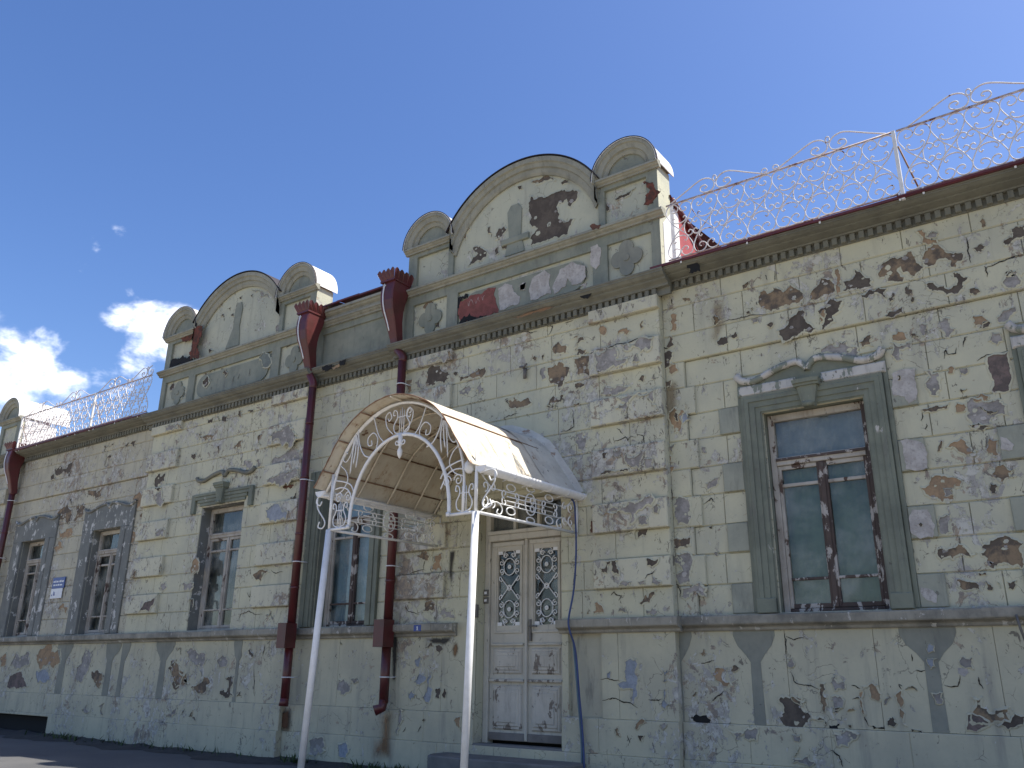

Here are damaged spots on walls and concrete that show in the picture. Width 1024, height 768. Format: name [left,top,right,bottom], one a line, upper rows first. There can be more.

spalling [518,176,580,246]
flaking render [457,244,601,324]
peeling [532,298,691,476]
spalling [712,229,1024,592]
peeling [0,644,61,690]
spalling [778,658,923,767]
spalling [931,656,1024,733]